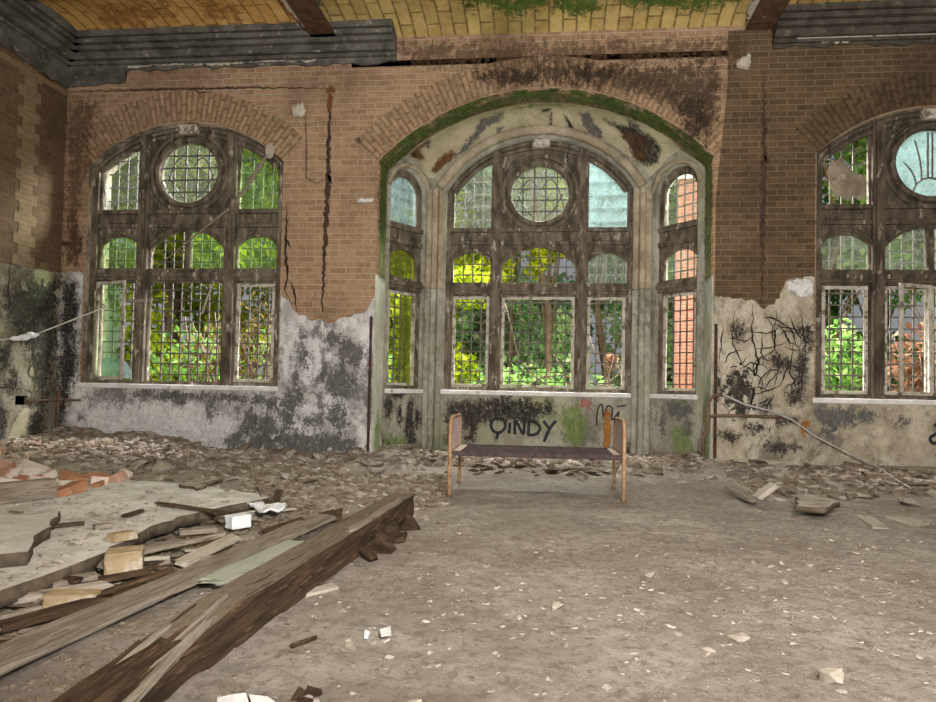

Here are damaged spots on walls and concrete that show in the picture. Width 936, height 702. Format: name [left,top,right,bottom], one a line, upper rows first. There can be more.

peeling [410,111,504,173]
spalling [580,112,661,167]
leakage [679,92,713,145]
crack [284,204,297,312]
leakage [280,317,348,420]
leakage [359,339,372,368]
leakage [80,389,283,449]